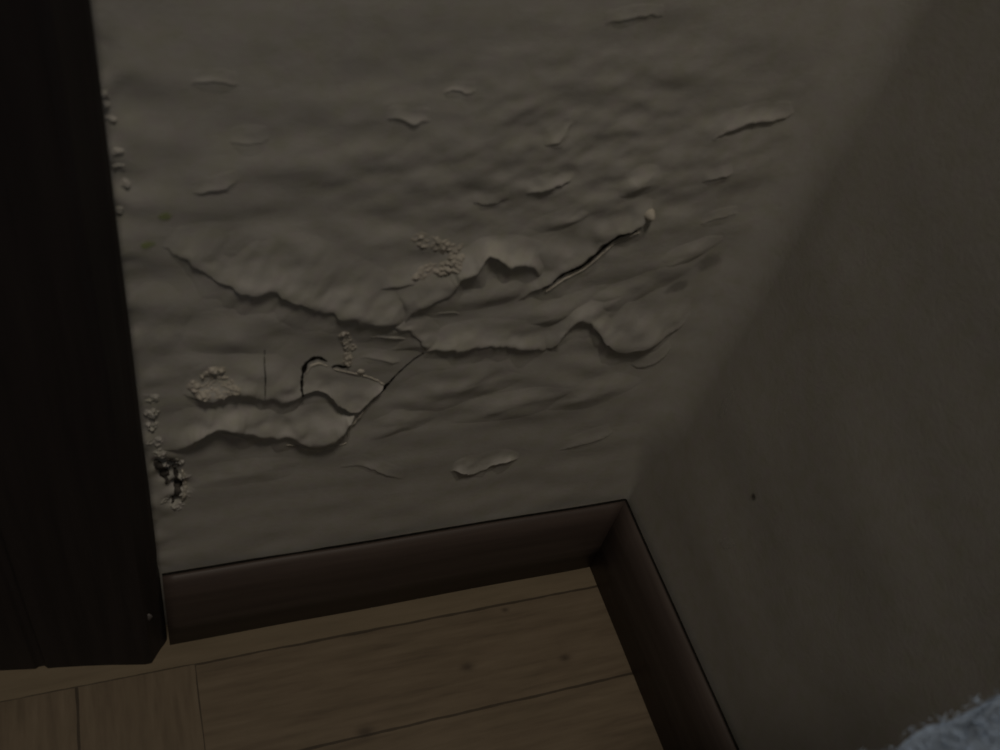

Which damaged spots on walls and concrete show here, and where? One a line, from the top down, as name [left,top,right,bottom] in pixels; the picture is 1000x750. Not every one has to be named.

crack [543,230,640,292]
crack [300,356,348,397]
crack [347,352,424,436]
peeling [143,197,690,510]